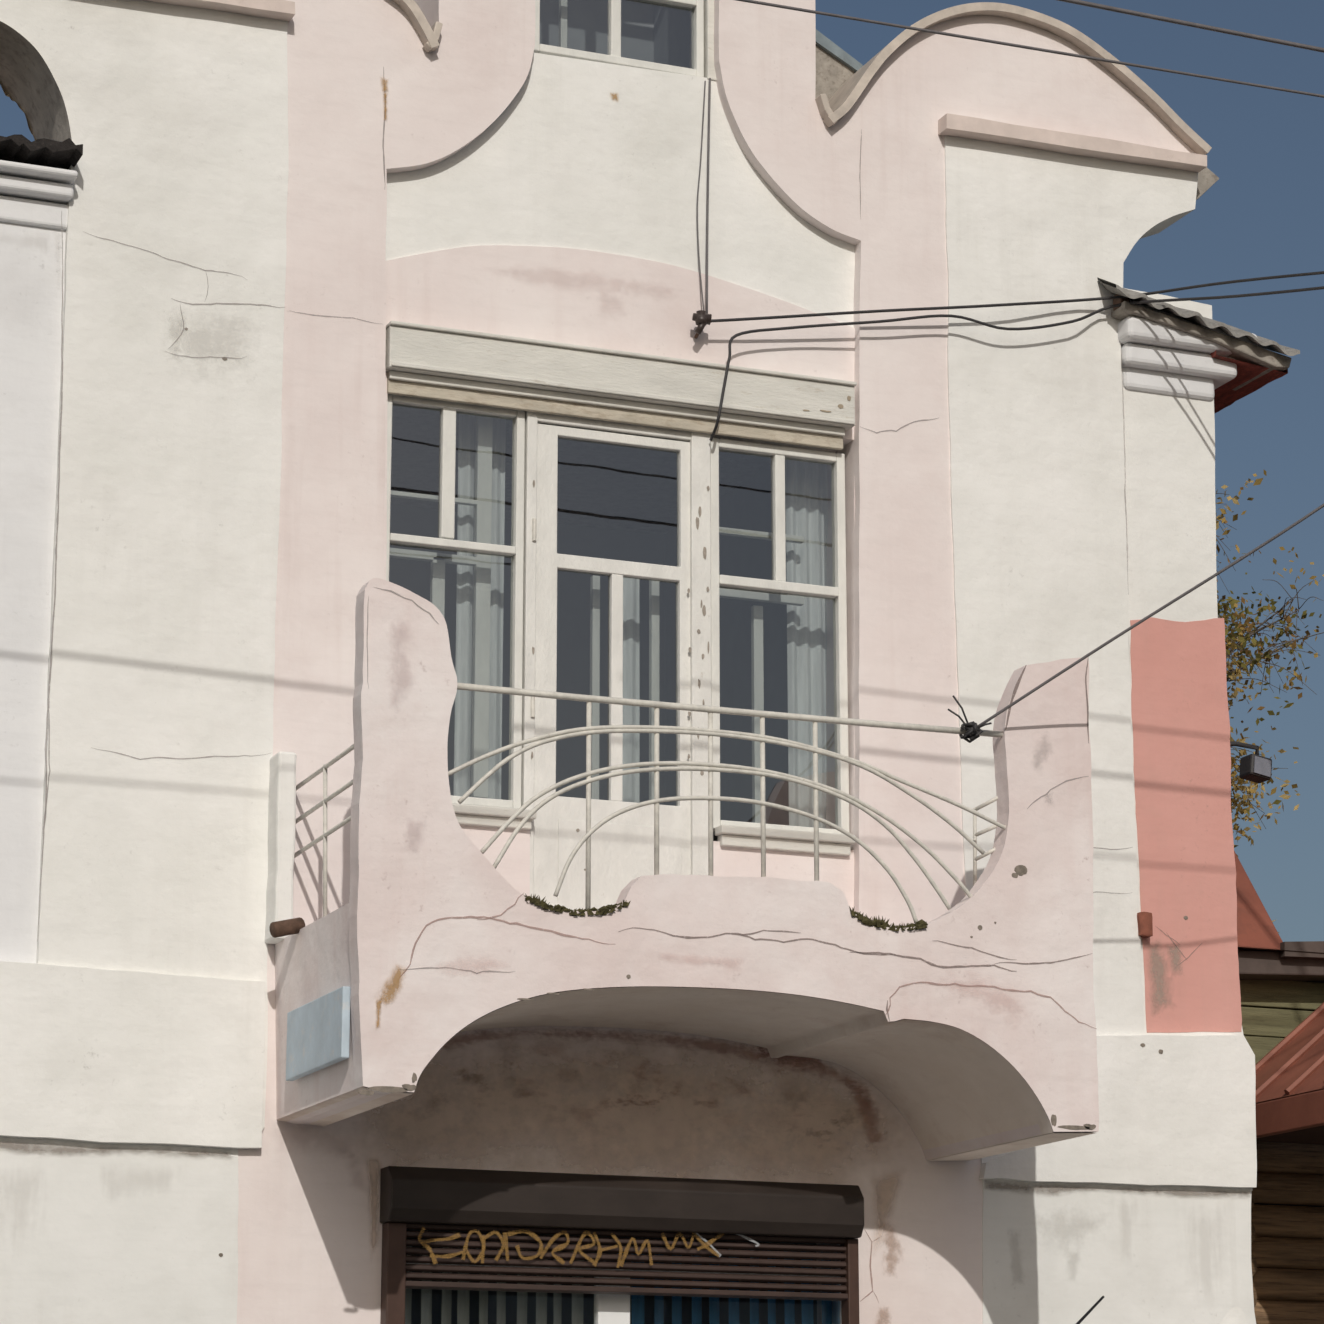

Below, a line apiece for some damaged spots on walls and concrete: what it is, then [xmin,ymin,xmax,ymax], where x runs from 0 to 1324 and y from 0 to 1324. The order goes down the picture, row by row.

crack [37,212,379,941]
rust [377,969,401,1027]
crack [399,893,1096,1029]
water stain [376,1061,881,1171]